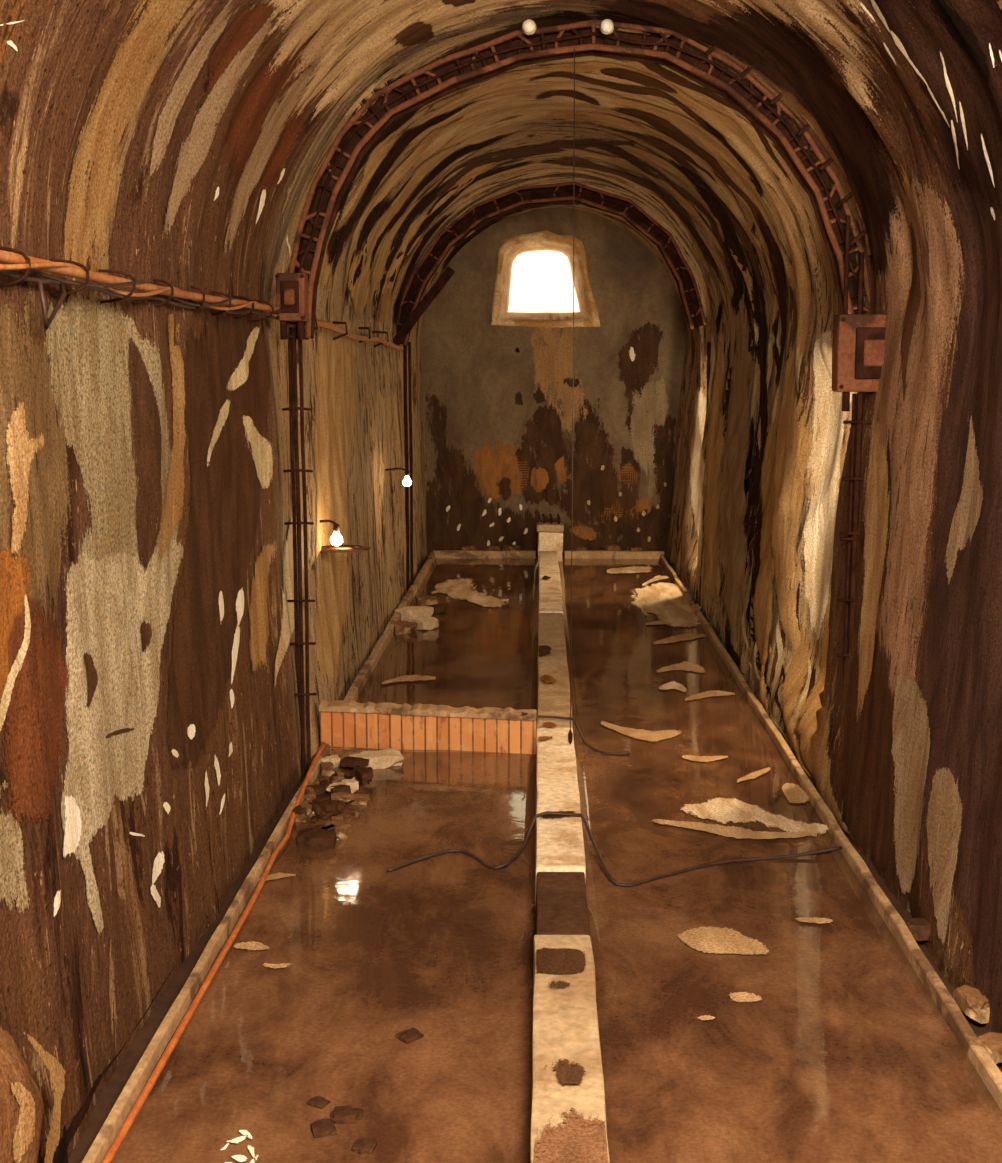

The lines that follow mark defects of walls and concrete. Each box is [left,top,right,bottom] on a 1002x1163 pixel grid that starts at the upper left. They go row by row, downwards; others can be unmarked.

leakage [61,0,193,281]
rust [469,437,567,501]
leakage [150,0,1002,1033]
leakage [39,923,205,1163]
leakage [544,1058,585,1085]